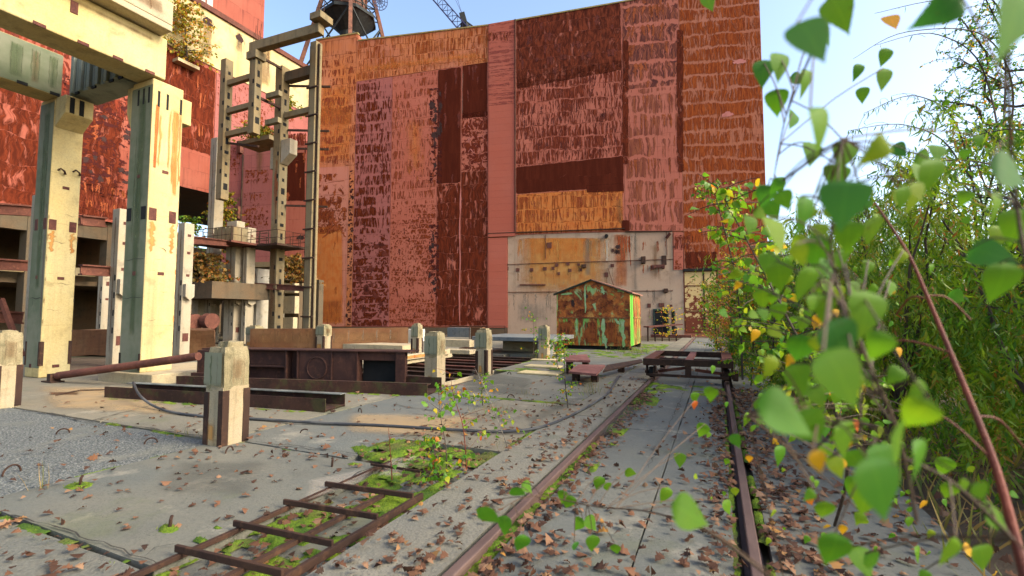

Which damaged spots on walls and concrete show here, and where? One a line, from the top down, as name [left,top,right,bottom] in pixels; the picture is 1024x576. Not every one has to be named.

rust [0,88,41,205]
rust [79,100,123,227]
rust [153,50,216,194]
rust [317,27,488,326]
rust [516,3,666,343]
peeling [601,318,626,348]